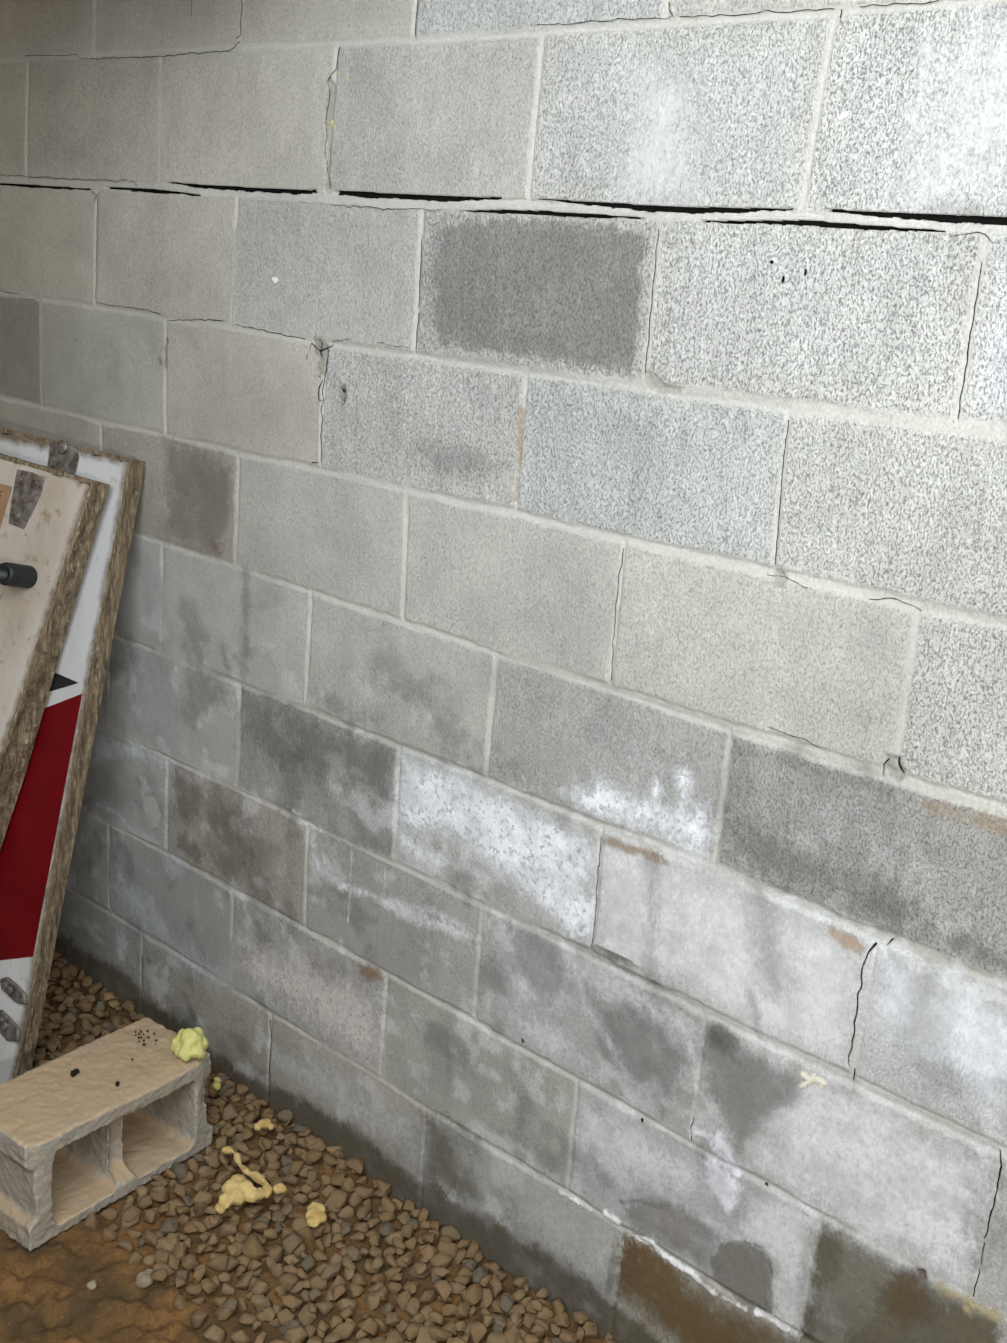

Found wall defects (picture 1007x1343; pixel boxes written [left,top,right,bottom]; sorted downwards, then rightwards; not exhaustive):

crack [0,48,1007,419]
crack [95,246,345,463]
damp [292,810,479,940]
damp [55,938,187,1033]
damp [244,950,383,1064]
damp [392,754,1007,1343]
crack [848,938,894,1080]
damp [206,1050,659,1343]
crack [973,1150,1002,1297]